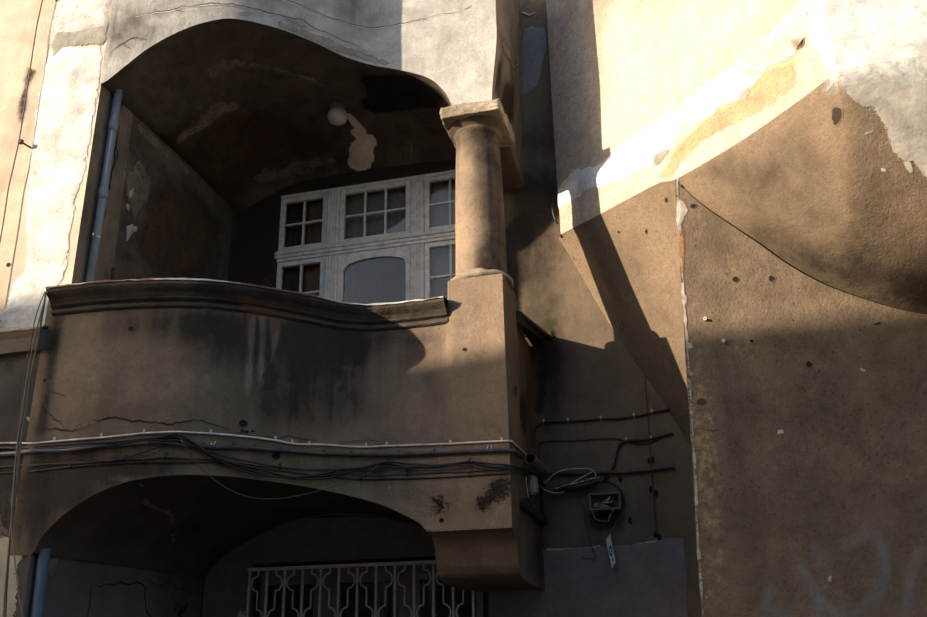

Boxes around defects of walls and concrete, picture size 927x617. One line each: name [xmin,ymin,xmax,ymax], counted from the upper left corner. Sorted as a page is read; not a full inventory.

crack [110,0,469,53]
spalling [19,69,35,120]
spalling [653,66,795,241]
peeling [126,160,151,241]
crack [39,392,310,441]
peeling [680,258,707,615]
water stain [474,475,512,513]
spalling [0,490,23,617]